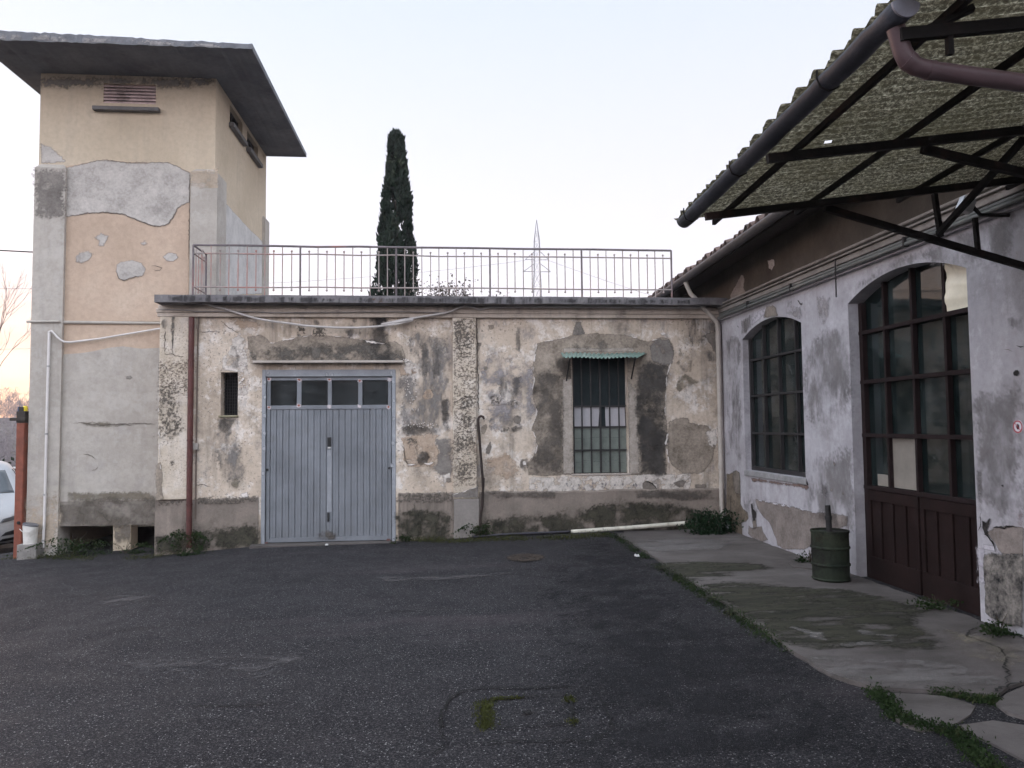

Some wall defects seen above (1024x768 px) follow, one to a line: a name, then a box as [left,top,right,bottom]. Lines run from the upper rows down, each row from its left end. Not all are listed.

leakage [33,169,67,218]
flaking render [396,319,717,503]
leakage [636,338,697,476]
flaking render [726,471,848,550]
flaking render [977,513,1024,628]